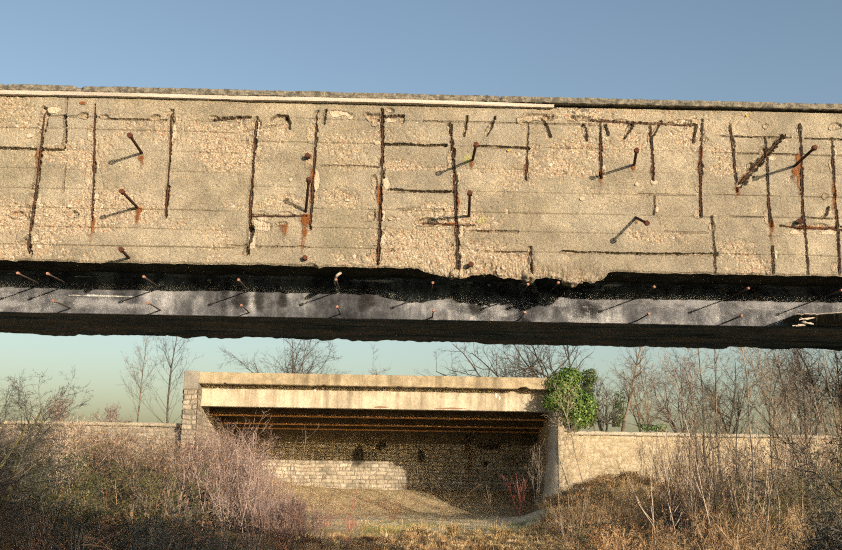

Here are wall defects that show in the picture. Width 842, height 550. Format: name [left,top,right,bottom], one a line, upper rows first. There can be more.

spalling [419,242,608,288]
water stain [0,299,26,307]
water stain [223,287,264,309]
water stain [354,279,393,309]
water stain [470,293,483,314]
water stain [579,292,601,316]
water stain [736,293,800,313]